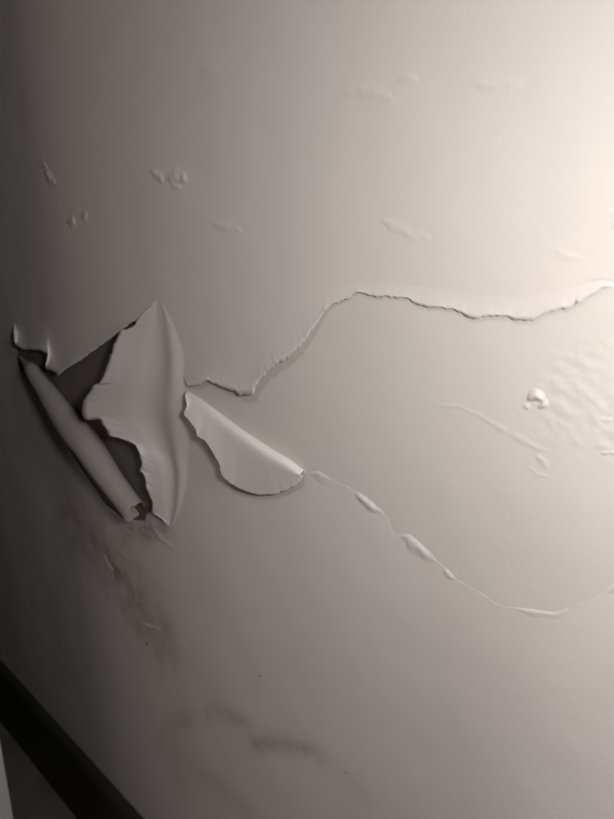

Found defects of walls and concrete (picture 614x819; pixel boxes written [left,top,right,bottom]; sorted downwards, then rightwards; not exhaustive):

peeling [12,278,614,619]